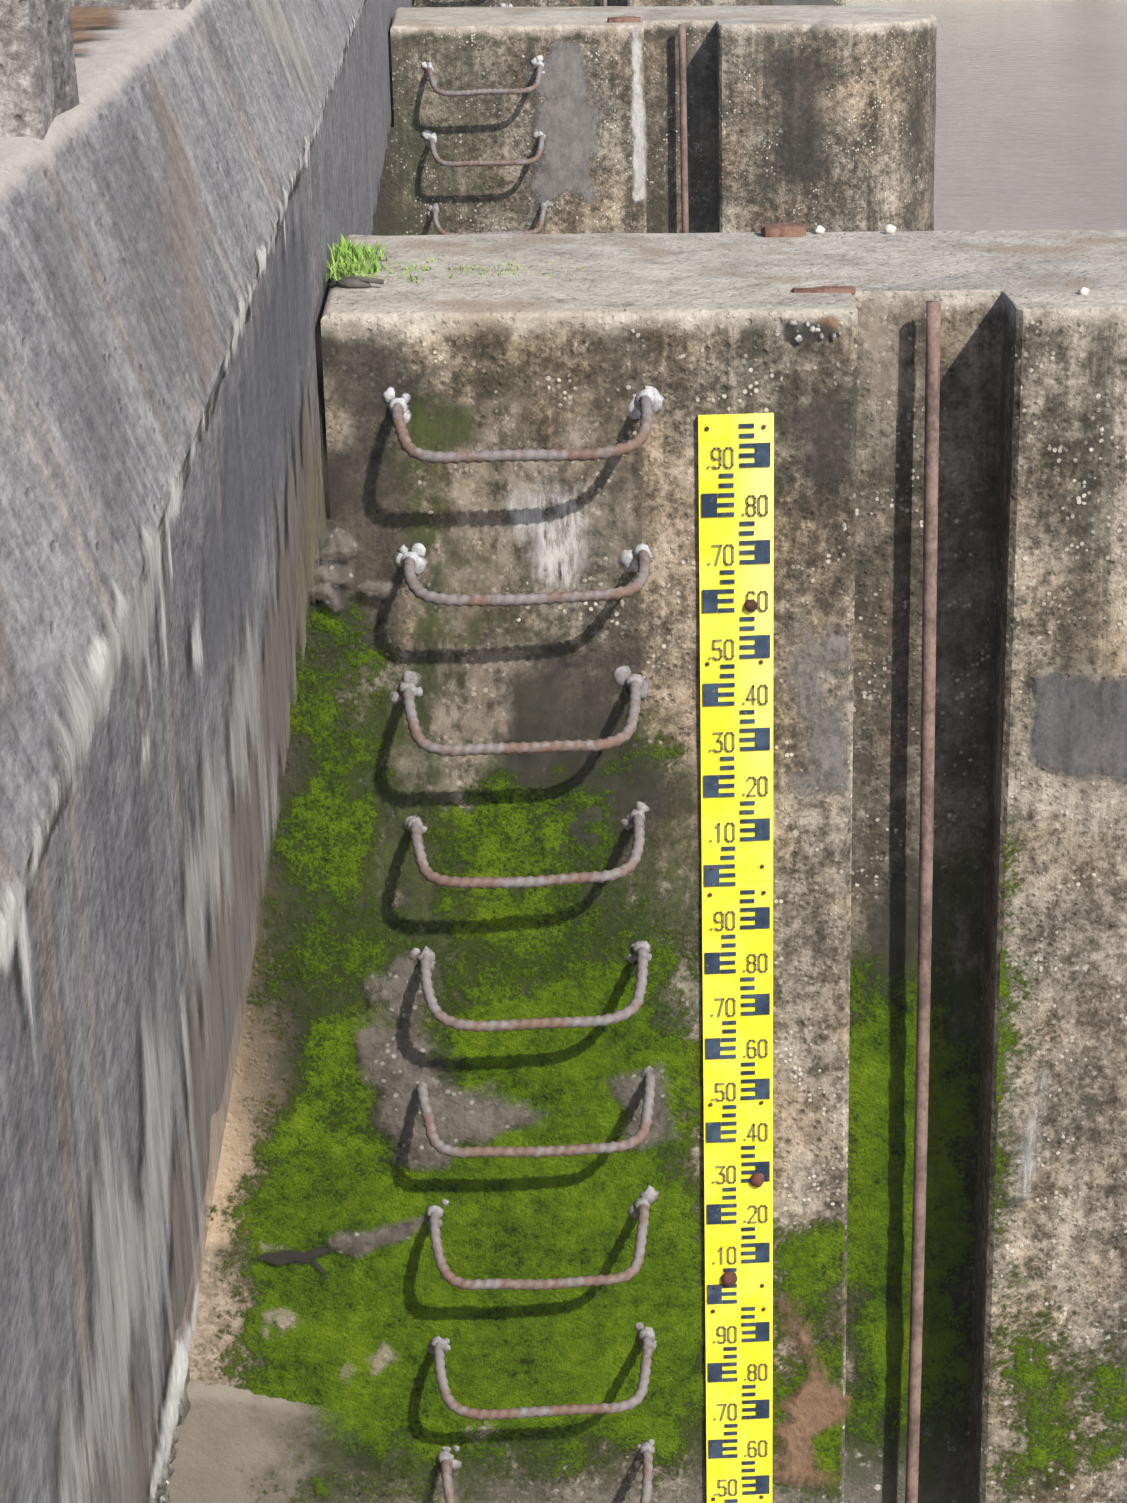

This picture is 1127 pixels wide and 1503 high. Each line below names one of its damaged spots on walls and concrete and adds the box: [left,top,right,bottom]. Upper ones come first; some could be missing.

leakage [447,648,678,856]